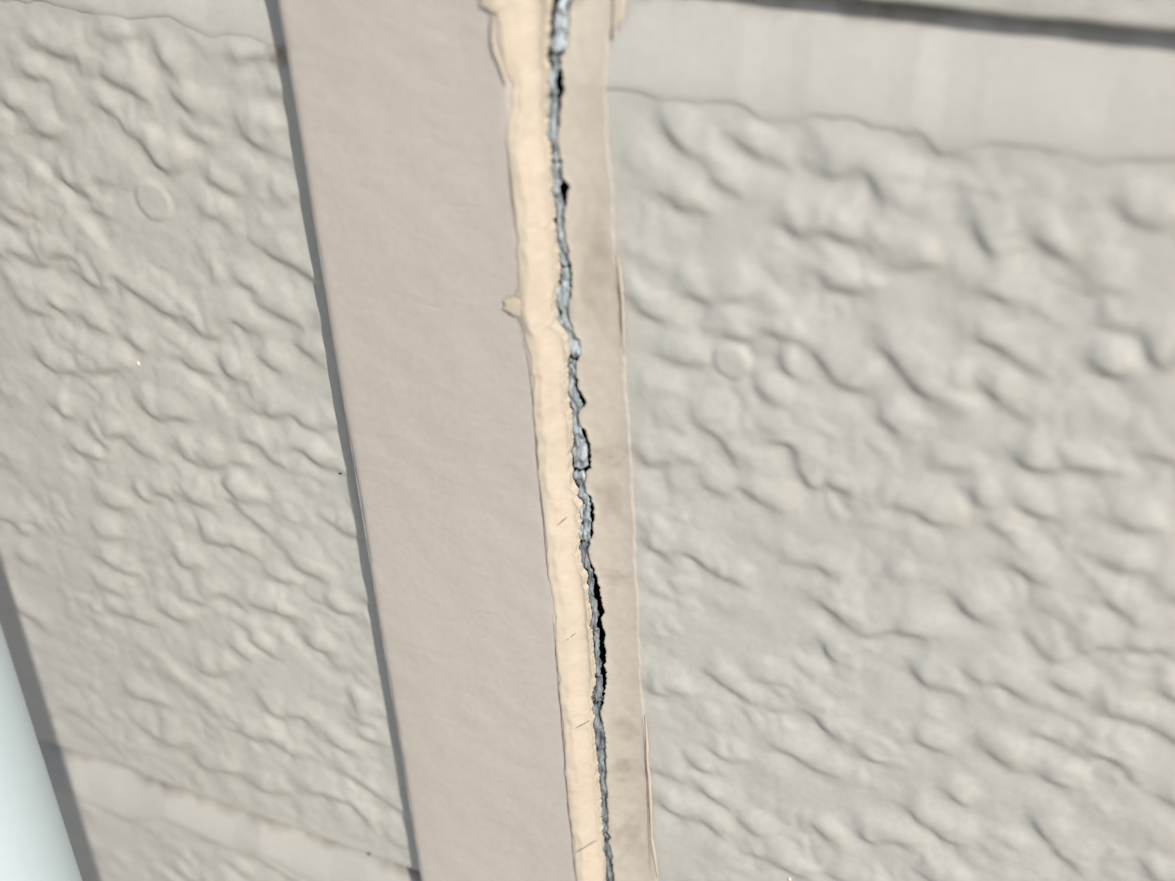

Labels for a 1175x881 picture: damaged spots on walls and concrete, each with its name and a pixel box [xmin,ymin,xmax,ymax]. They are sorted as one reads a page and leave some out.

crack [520,0,614,881]